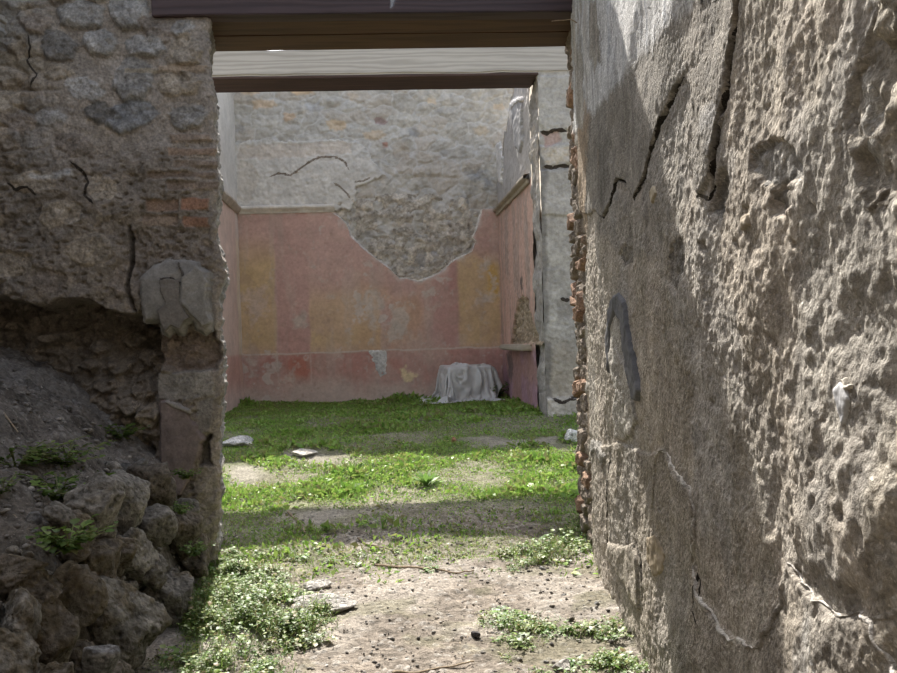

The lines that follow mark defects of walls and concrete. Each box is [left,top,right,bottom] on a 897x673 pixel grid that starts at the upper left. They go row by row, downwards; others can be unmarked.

flaking render [270,155,349,177]
flaking render [324,182,482,282]
crack [603,77,695,219]
crack [695,0,740,201]
flaking render [369,350,387,377]
crack [650,449,897,673]